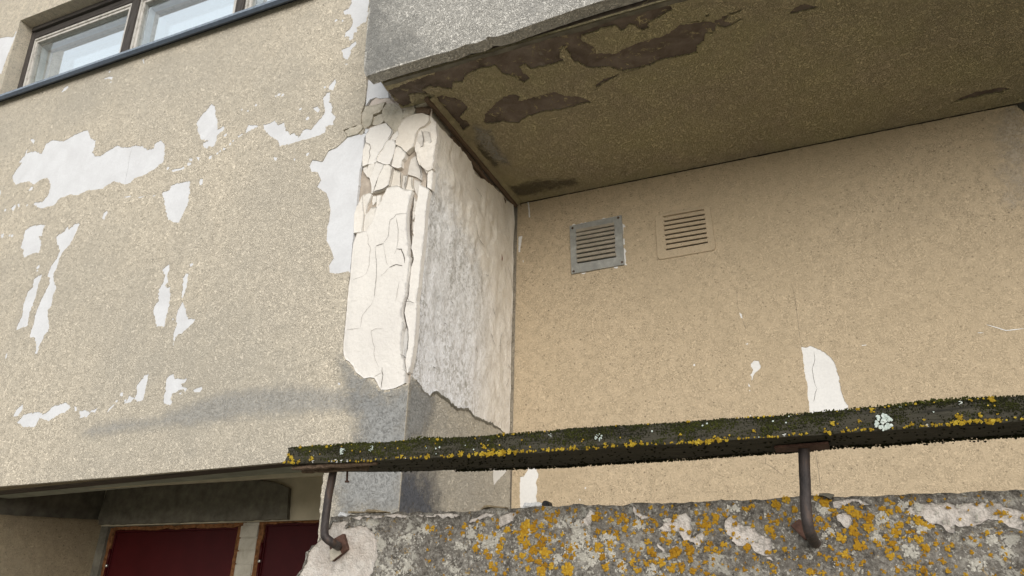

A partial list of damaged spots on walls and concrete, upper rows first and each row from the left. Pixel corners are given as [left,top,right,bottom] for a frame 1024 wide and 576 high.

peeling [1,223,79,354]
peeling [4,80,336,223]
peeling [153,263,195,343]
crack [348,123,439,385]
flaking render [294,0,741,433]
peeling [14,374,148,428]
peeling [164,374,202,405]
peeling [801,346,848,413]